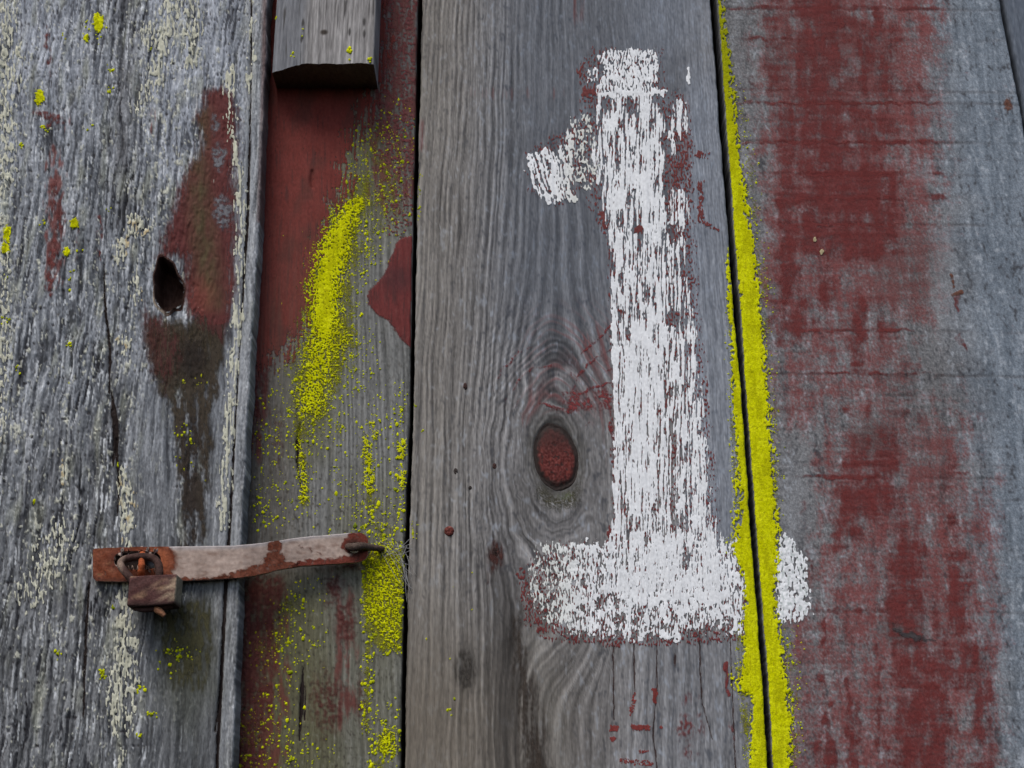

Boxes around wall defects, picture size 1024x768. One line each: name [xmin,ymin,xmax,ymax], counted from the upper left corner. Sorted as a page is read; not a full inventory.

crack [103,264,120,516]
peeling [115,314,183,390]
peeling [159,0,257,531]
peeling [516,46,746,648]
peeling [742,0,939,375]
rust [93,533,368,582]
peeling [807,434,993,768]